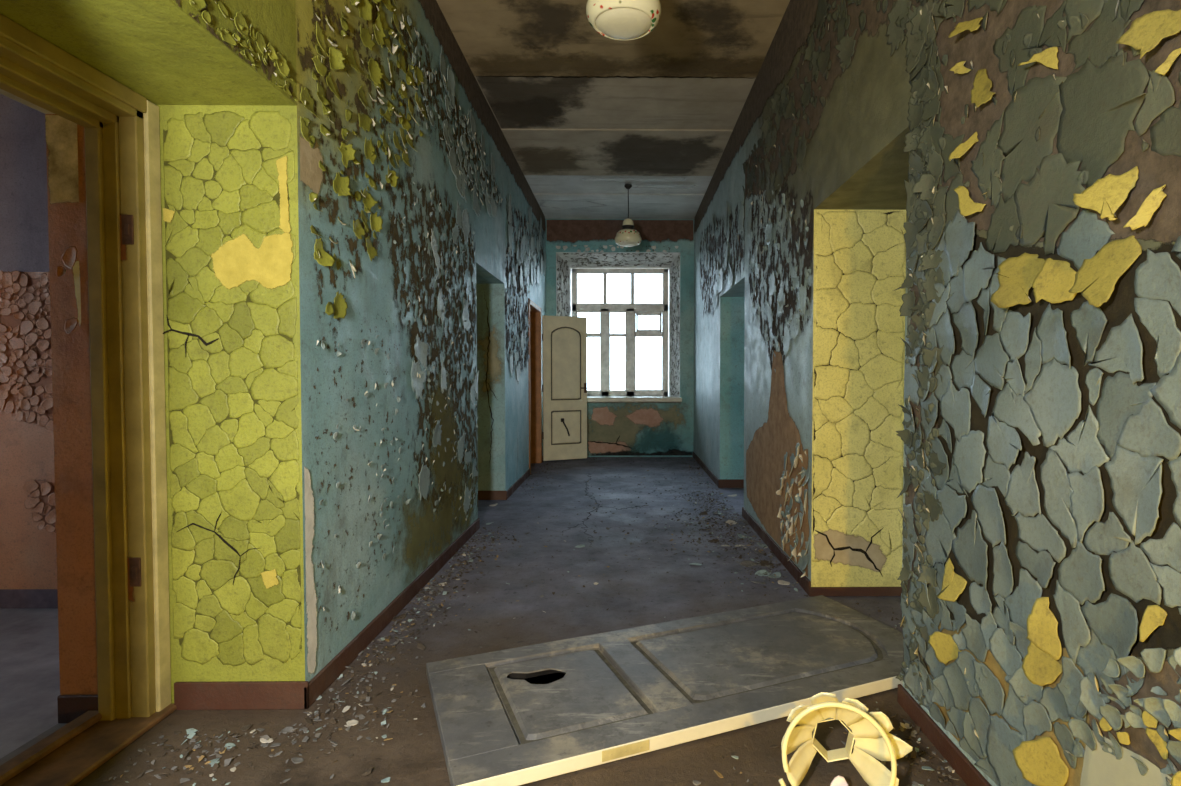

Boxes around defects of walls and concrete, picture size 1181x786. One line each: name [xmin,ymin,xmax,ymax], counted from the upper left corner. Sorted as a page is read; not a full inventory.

damp [472,0,764,129]
damp [517,135,721,188]
peeling [0,246,81,432]
crack [163,315,219,357]
peeling [163,0,680,673]
peeling [694,0,1181,786]
peeling [21,480,56,532]
crack [177,511,258,583]